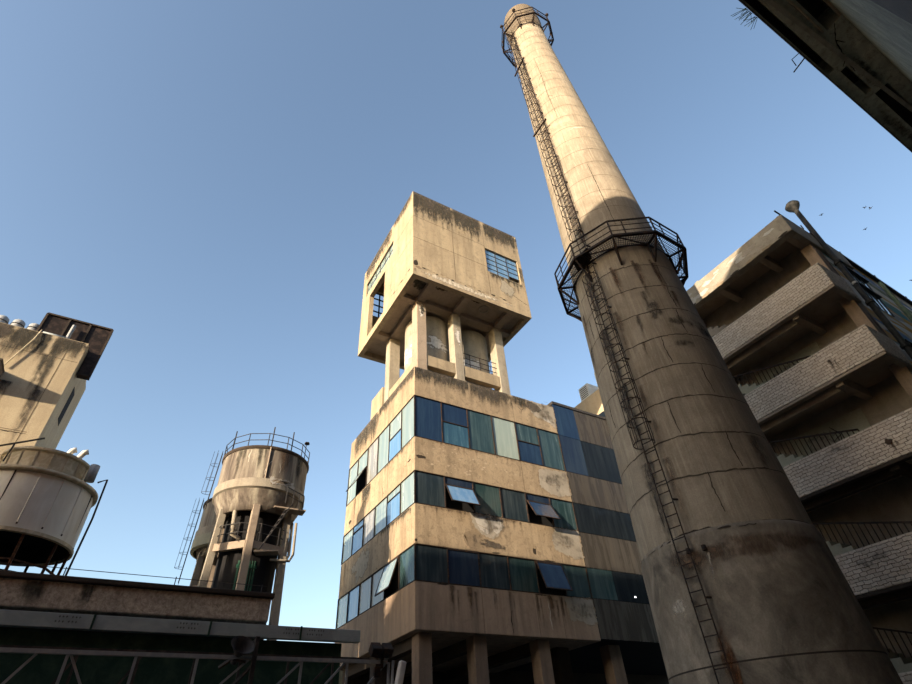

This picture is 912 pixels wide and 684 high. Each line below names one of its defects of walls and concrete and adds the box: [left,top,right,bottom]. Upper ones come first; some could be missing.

leakage [367,191,516,276]
leakage [0,322,87,424]
leakage [356,344,541,453]
peeling [537,467,572,498]
peeling [463,512,506,554]
peeling [533,527,585,562]